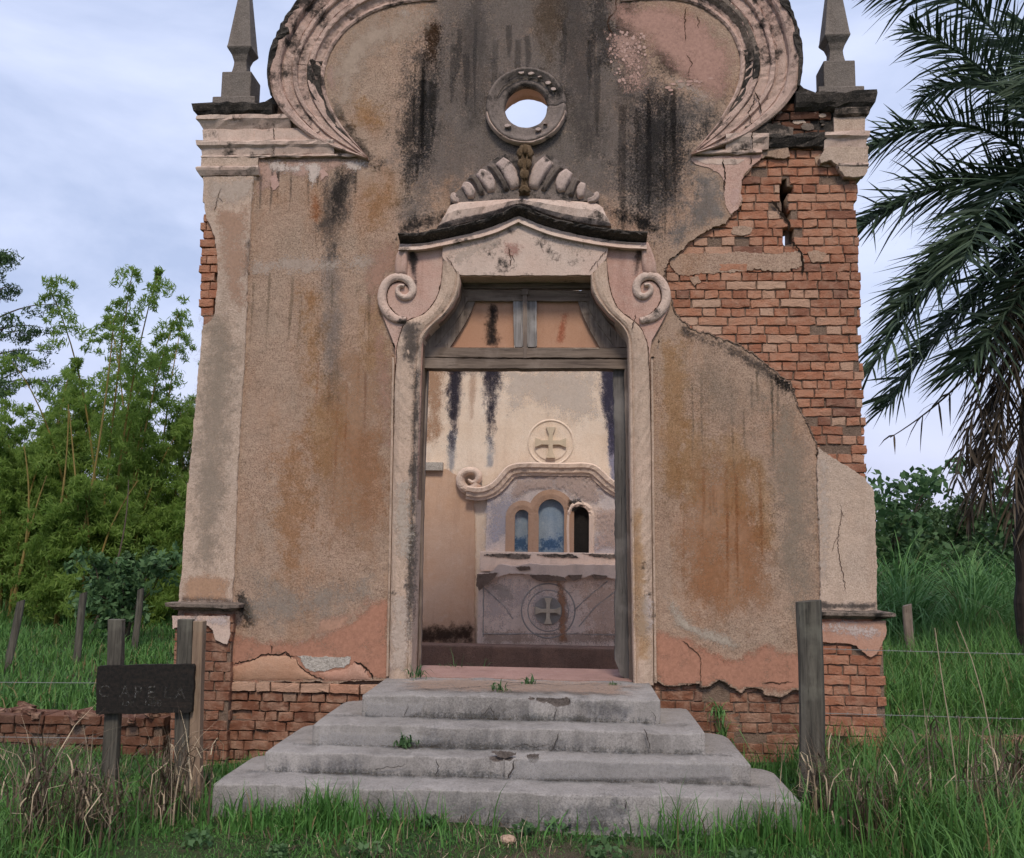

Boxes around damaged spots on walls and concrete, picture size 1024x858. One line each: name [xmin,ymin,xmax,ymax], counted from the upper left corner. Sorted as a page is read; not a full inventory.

flaking render [199,214,218,325]
crack [772,201,805,276]
flaking render [663,148,867,477]
water stain [447,372,460,443]
water stain [485,372,500,422]
crack [832,504,846,589]
peeling [823,621,880,638]
flaking render [228,655,378,763]